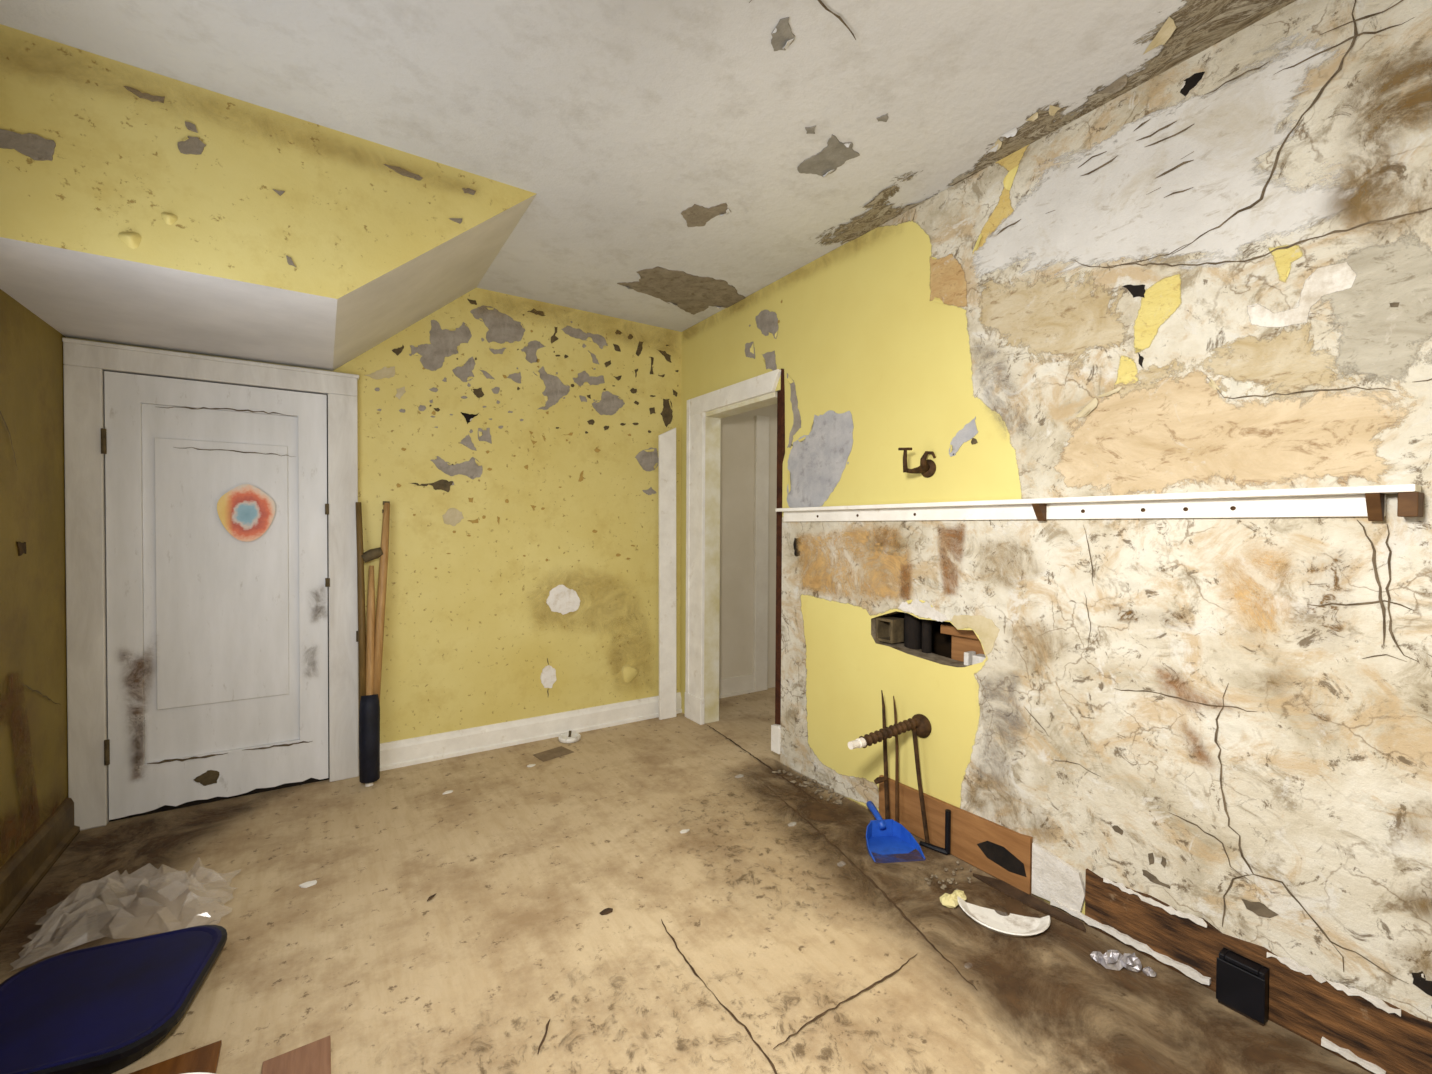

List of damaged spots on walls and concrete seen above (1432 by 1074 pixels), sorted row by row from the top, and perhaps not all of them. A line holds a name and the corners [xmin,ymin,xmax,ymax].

peeling [0,129,56,161]
peeling [177,121,206,155]
peeling [384,164,423,181]
peeling [681,203,731,227]
crack [1069,0,1432,268]
leakage [1339,59,1432,219]
peeling [617,266,745,315]
peeling [364,299,679,495]
peeling [745,0,1432,1022]
crack [1307,520,1432,662]
crack [1114,683,1409,984]